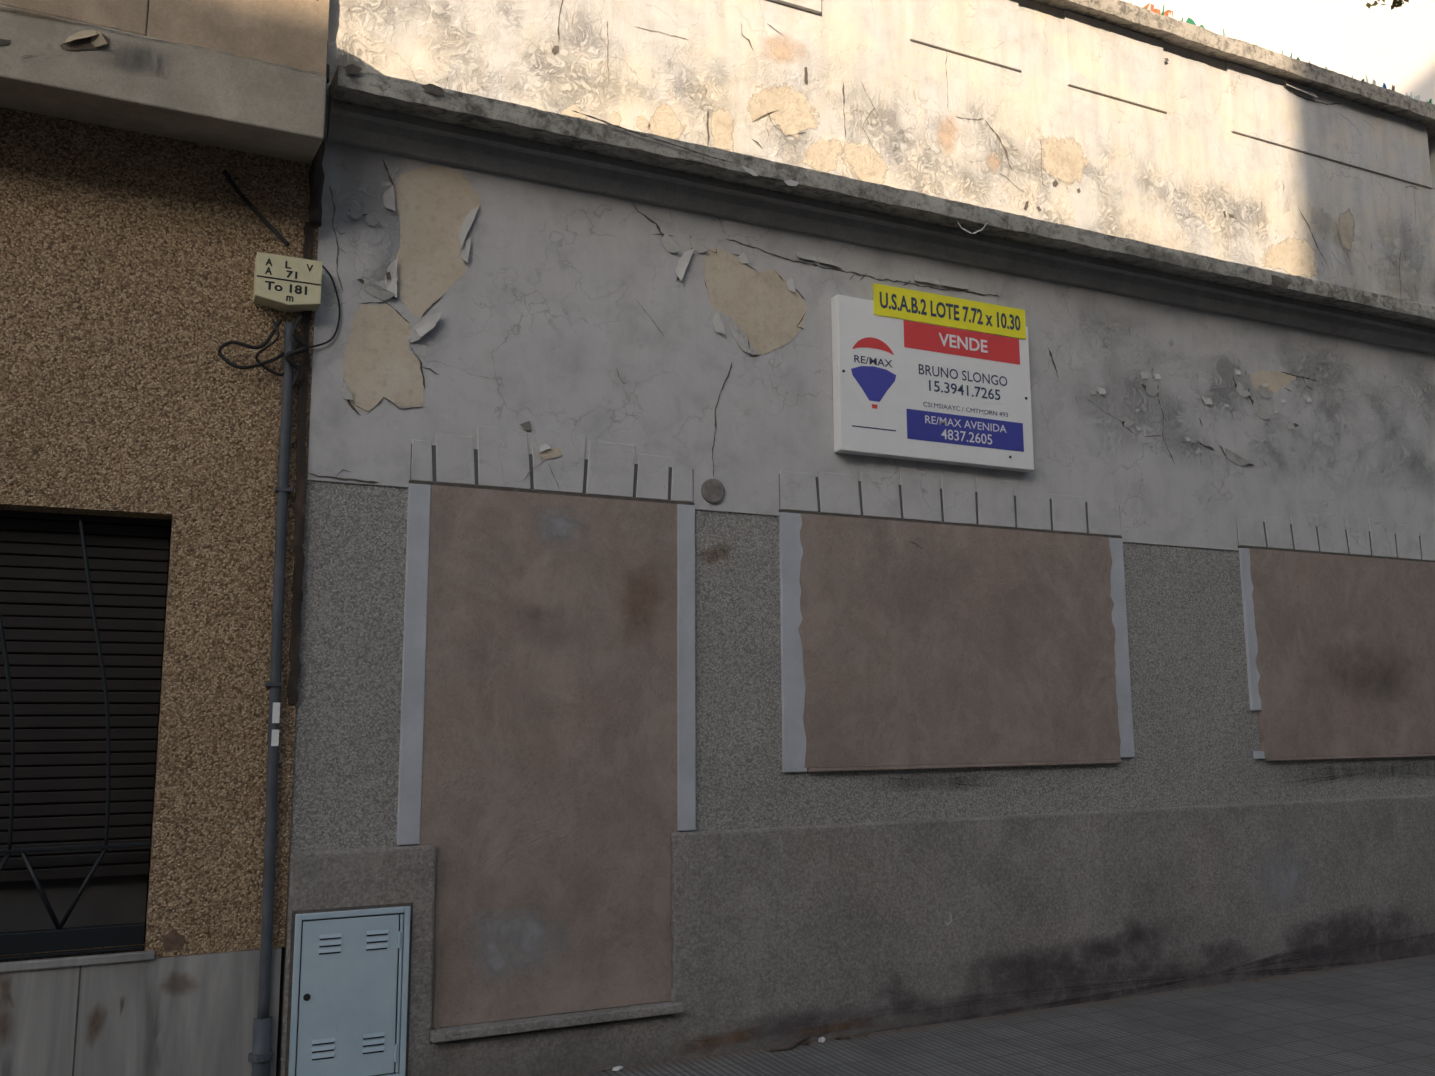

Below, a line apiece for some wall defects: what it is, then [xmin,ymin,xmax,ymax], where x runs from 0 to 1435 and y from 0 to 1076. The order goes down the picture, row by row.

peeling [706,67,888,184]
peeling [1037,137,1087,193]
peeling [340,160,481,416]
peeling [690,234,807,357]
peeling [1263,237,1318,289]
crack [712,363,732,478]